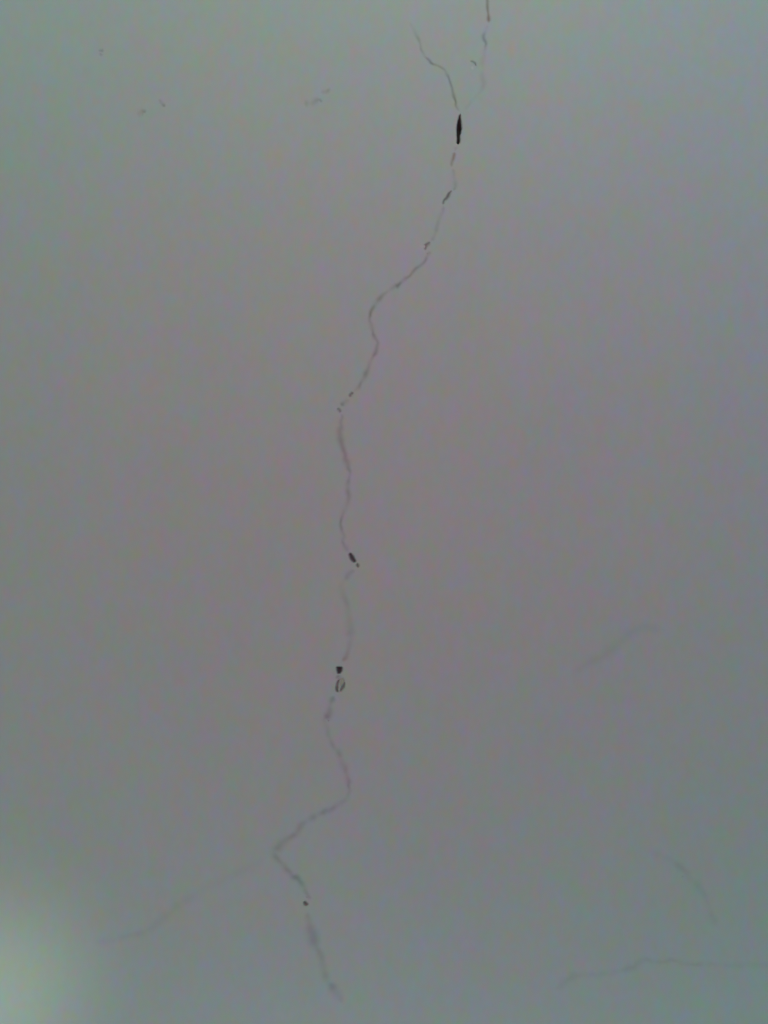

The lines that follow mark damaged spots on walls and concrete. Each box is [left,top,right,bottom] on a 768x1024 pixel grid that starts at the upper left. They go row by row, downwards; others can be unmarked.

crack [90,0,492,1005]